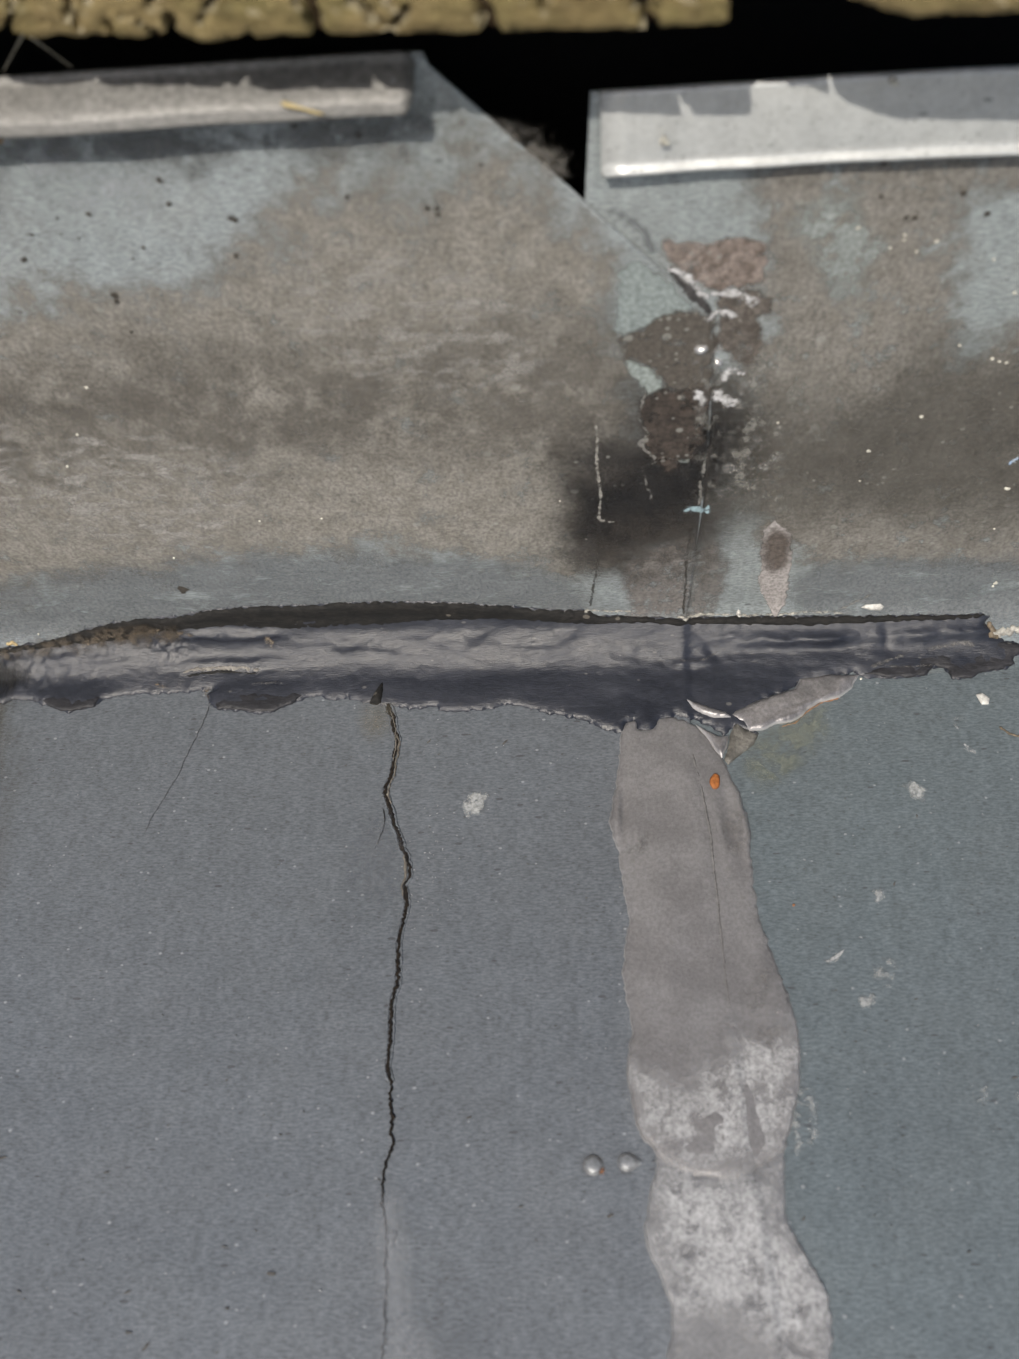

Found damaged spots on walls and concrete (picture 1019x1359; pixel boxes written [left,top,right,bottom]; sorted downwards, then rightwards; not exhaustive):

leakage [0,140,1019,607]
crack [375,703,414,1359]